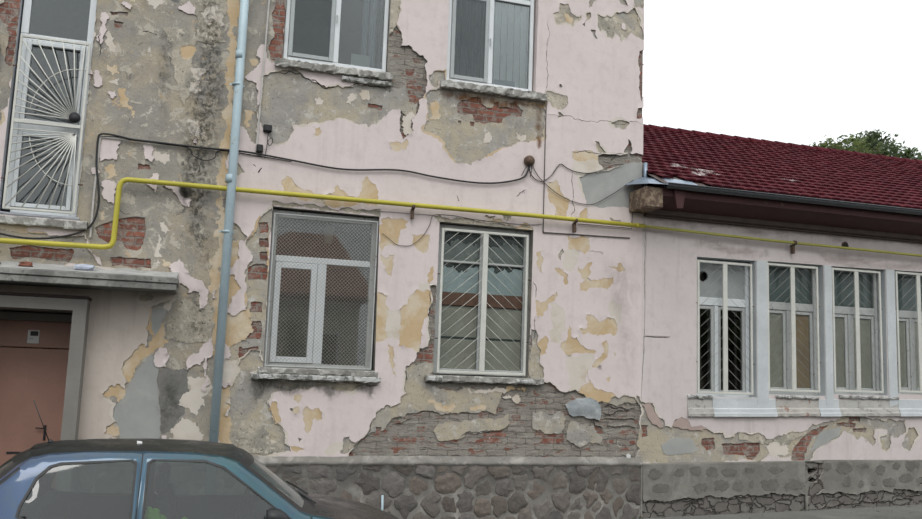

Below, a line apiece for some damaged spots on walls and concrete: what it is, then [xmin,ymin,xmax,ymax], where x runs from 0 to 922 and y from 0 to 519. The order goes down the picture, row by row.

damp [186,2,219,247]
spalling [553,0,644,130]
spalling [0,0,569,456]
peeling [555,235,625,291]
spalling [324,267,921,463]